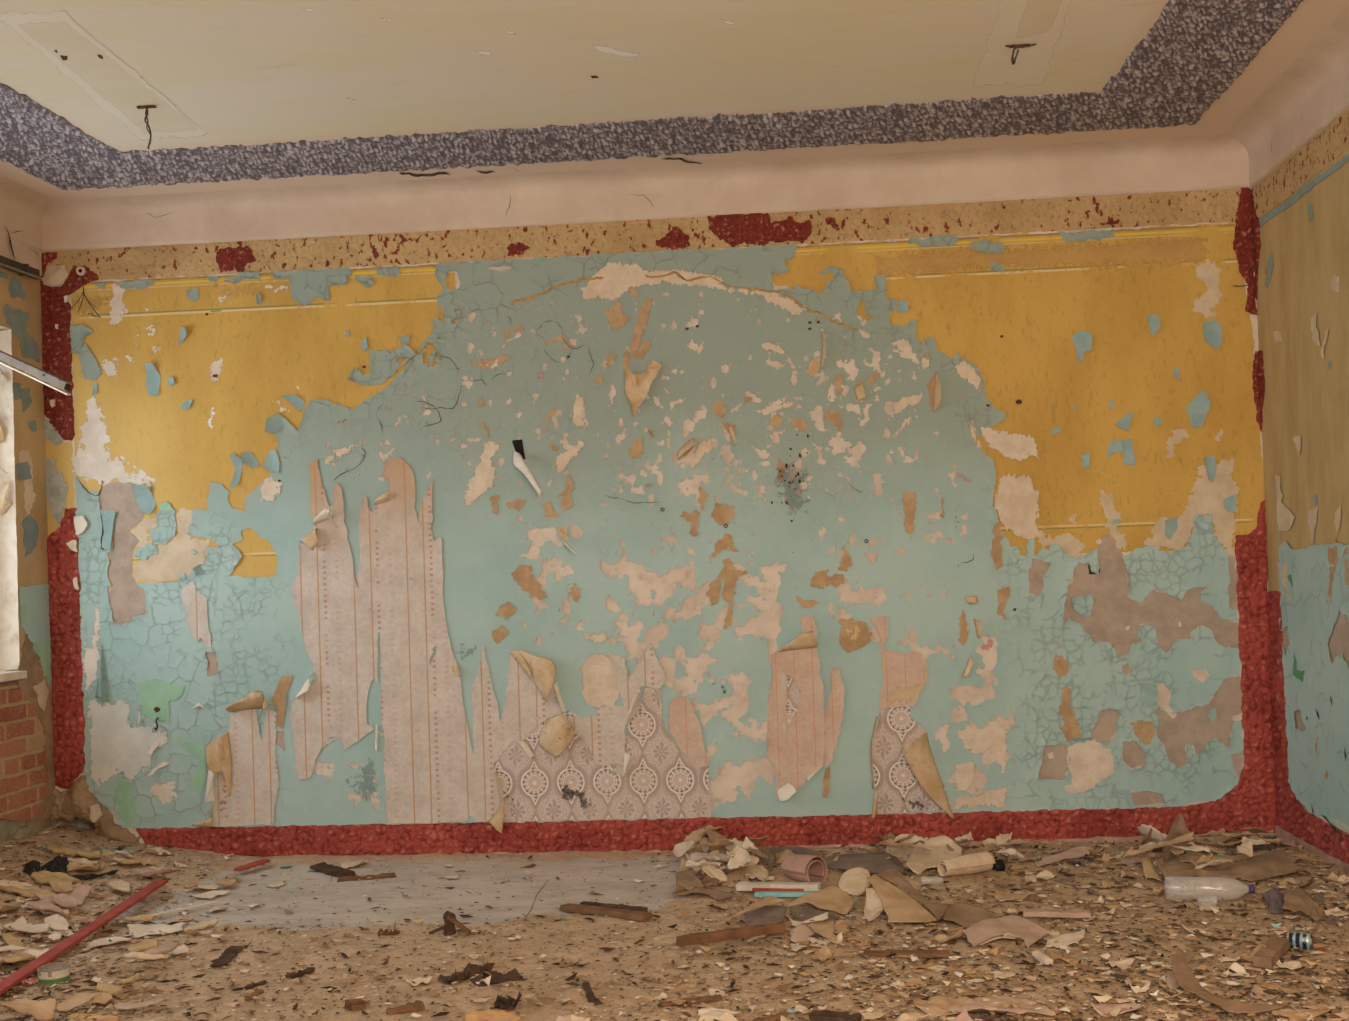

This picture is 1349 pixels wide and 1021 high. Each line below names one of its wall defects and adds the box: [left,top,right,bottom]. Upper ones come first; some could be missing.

peeling [1259,154,1349,227]
crack [507,277,603,375]
crack [645,271,859,331]
peeling [0,213,1349,853]